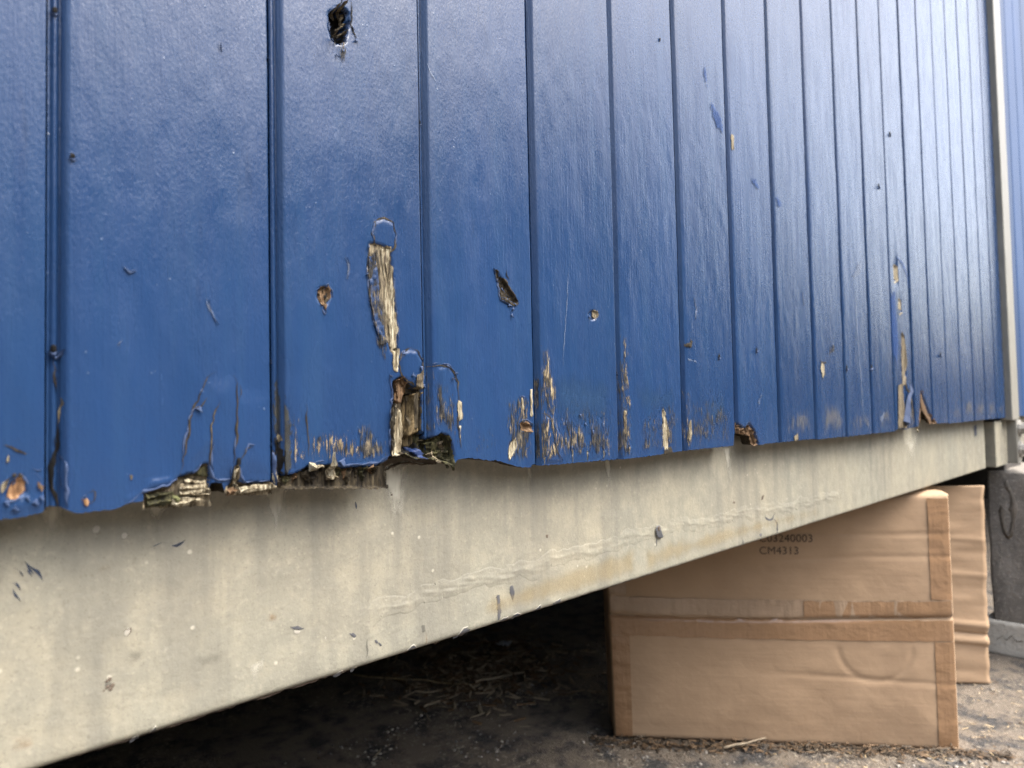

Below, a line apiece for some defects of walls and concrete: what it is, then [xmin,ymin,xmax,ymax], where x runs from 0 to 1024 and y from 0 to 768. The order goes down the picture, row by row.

peeling [1,445,45,512]
peeling [366,217,426,457]
spalling [494,269,519,318]
peeling [506,336,630,464]
peeling [645,392,759,455]
peeling [889,257,936,432]